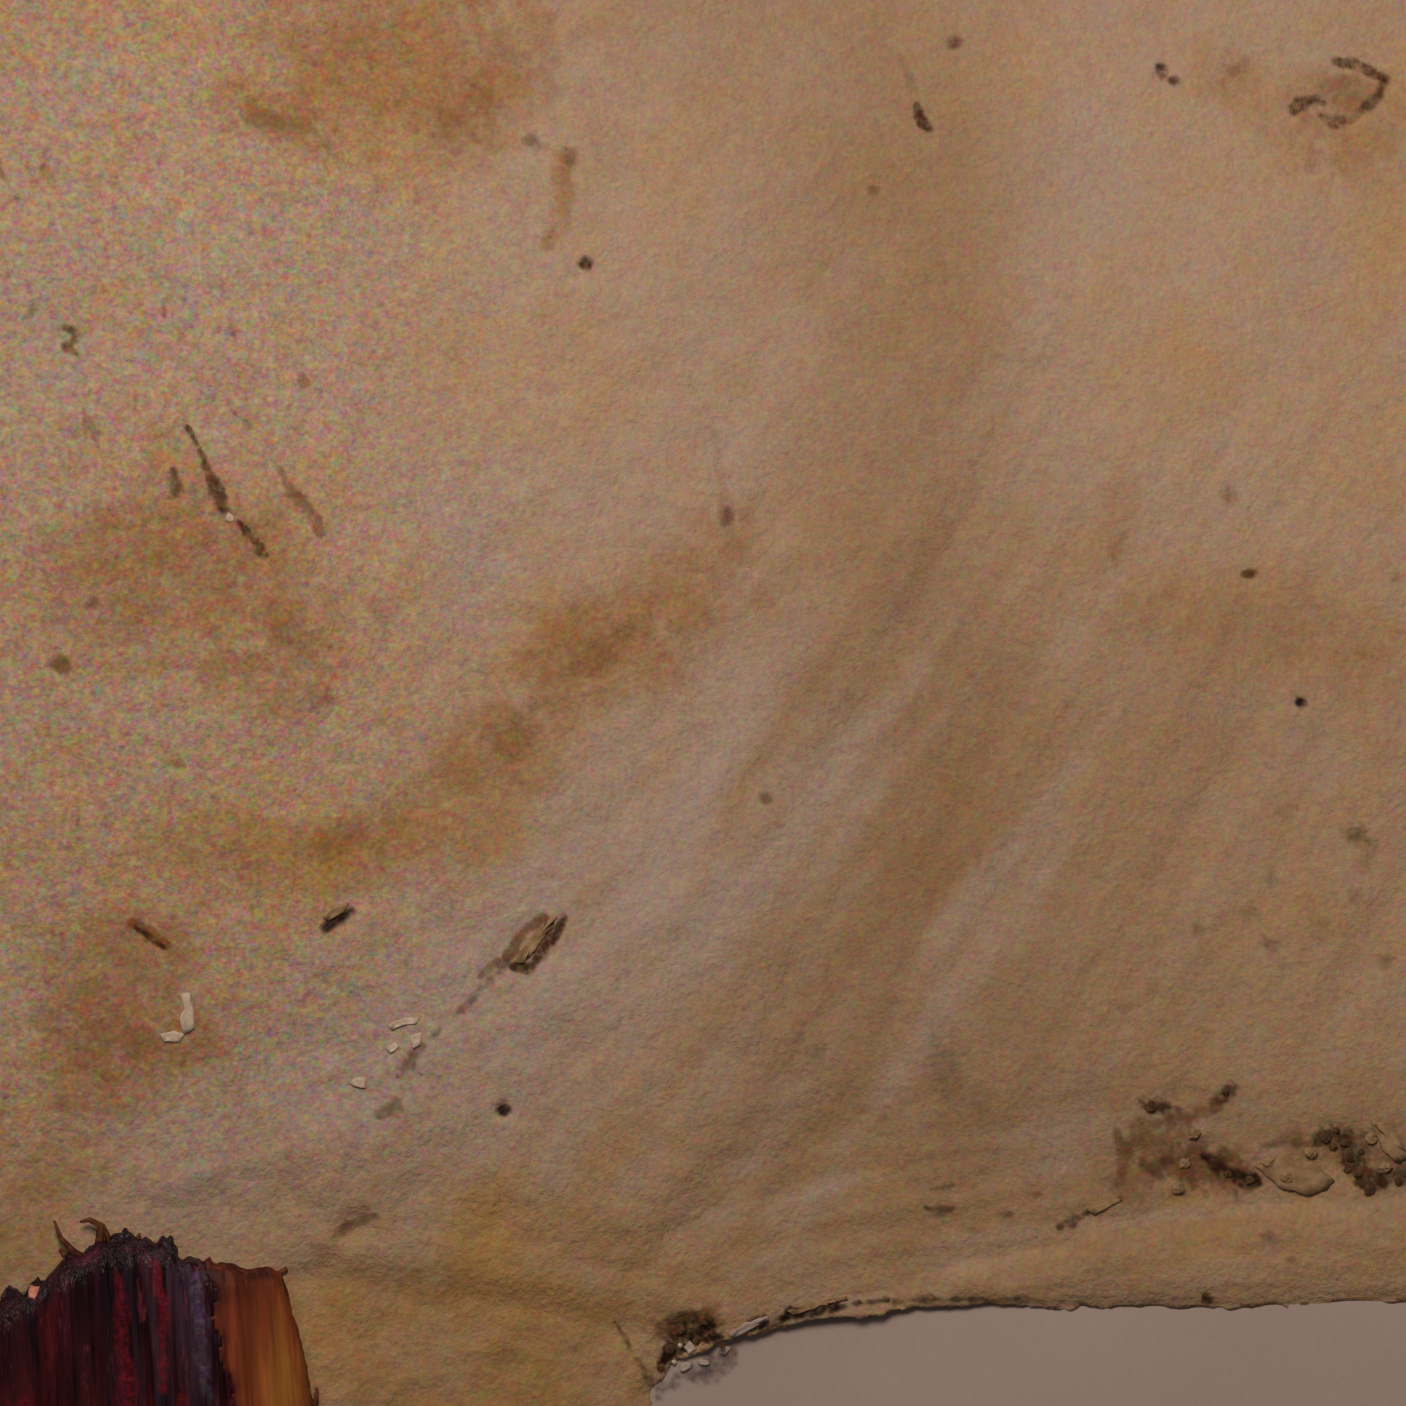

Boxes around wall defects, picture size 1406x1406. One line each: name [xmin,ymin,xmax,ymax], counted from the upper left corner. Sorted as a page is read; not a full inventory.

flaking render [503,914,566,974]